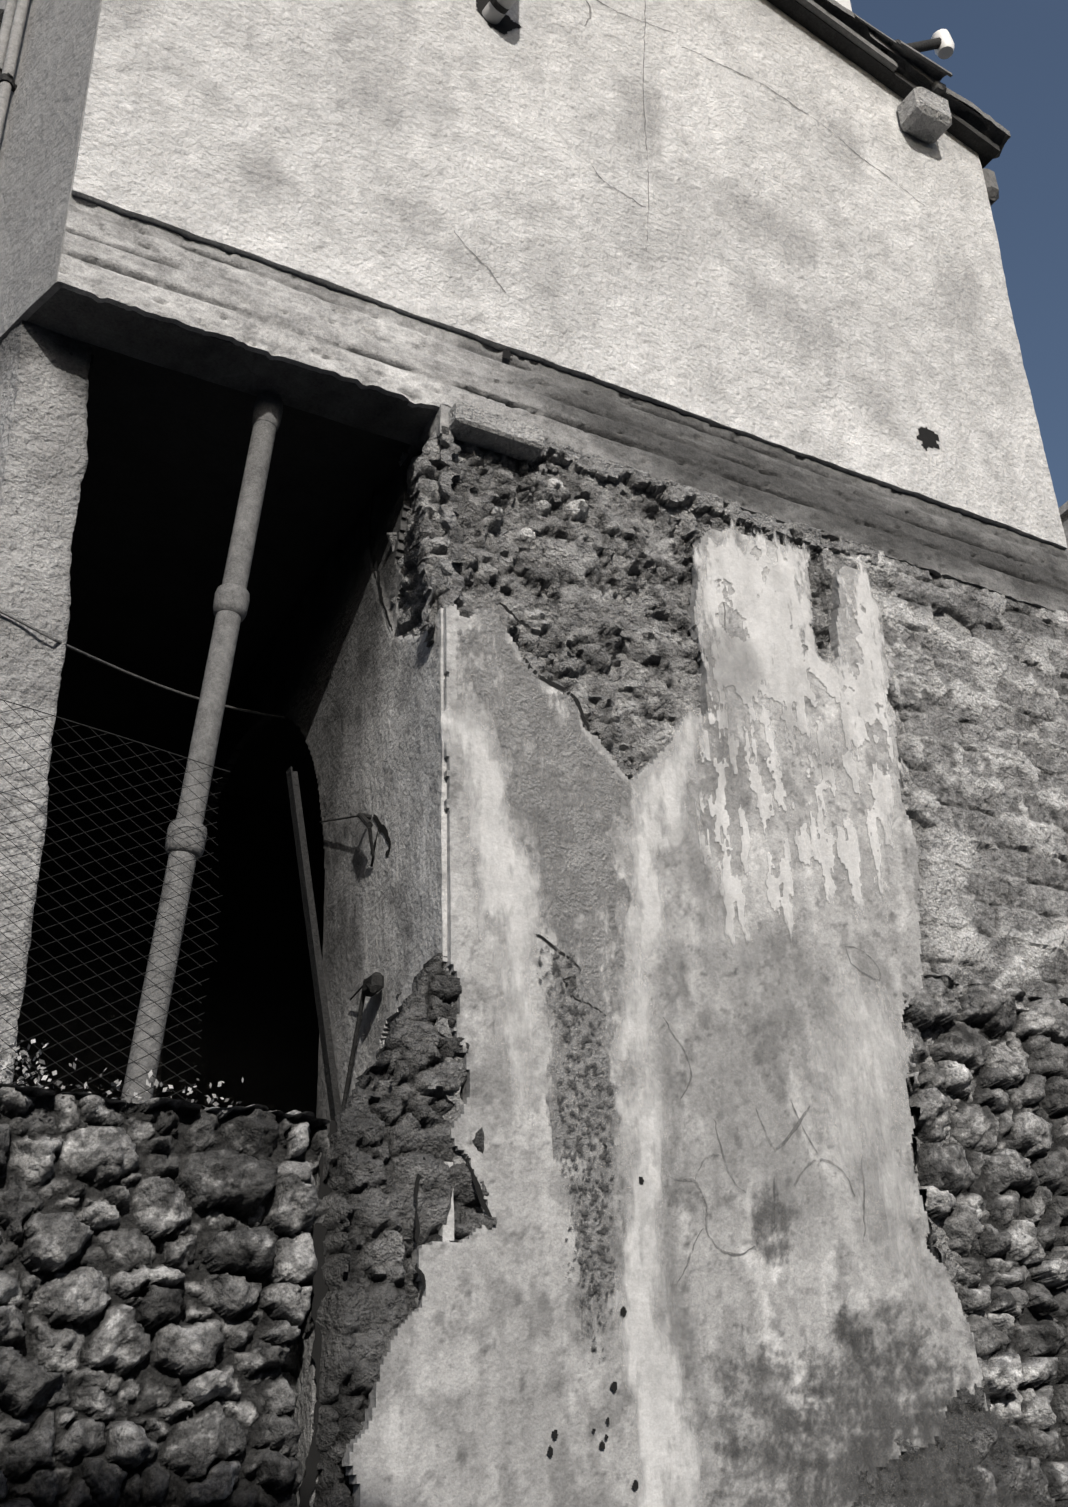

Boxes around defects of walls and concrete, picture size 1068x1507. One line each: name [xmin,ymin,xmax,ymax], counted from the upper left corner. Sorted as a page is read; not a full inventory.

crack [584,0,806,251]
crack [843,141,924,205]
spalling [917,427,940,451]
spalling [386,427,907,1359]
crack [667,1023,693,1098]
spalling [304,952,497,1507]
crack [677,1120,755,1282]
crack [796,1153,866,1234]